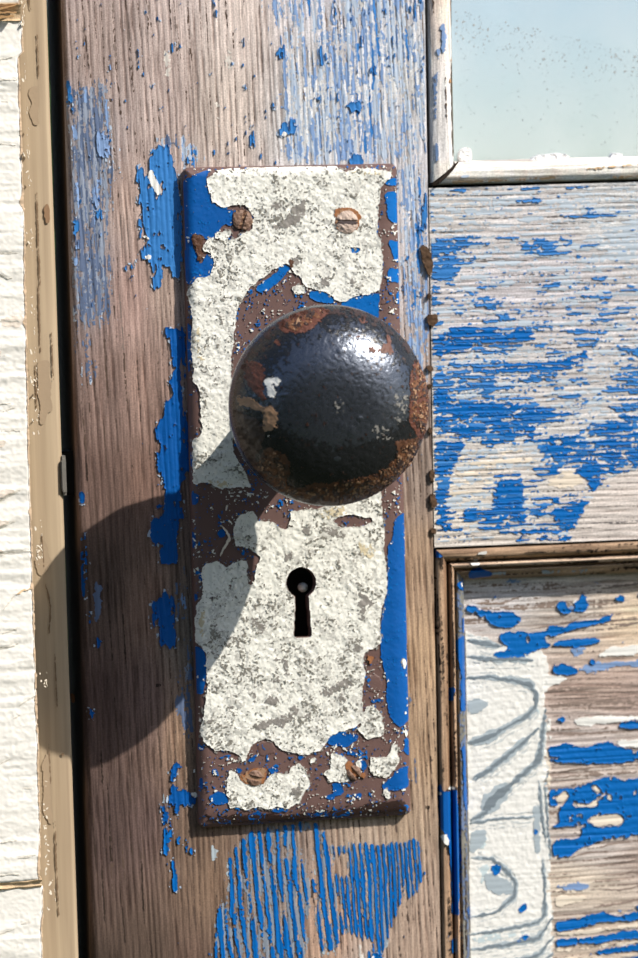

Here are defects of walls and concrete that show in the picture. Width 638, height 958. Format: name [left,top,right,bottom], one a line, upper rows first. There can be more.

peeling [126,164,163,276]
corrosion [334,207,362,230]
spalling [168,163,398,491]
corrosion [233,306,429,506]
spalling [197,365,429,816]
peeling [159,771,197,872]
corrosion [240,768,267,785]
corrosion [345,761,366,779]